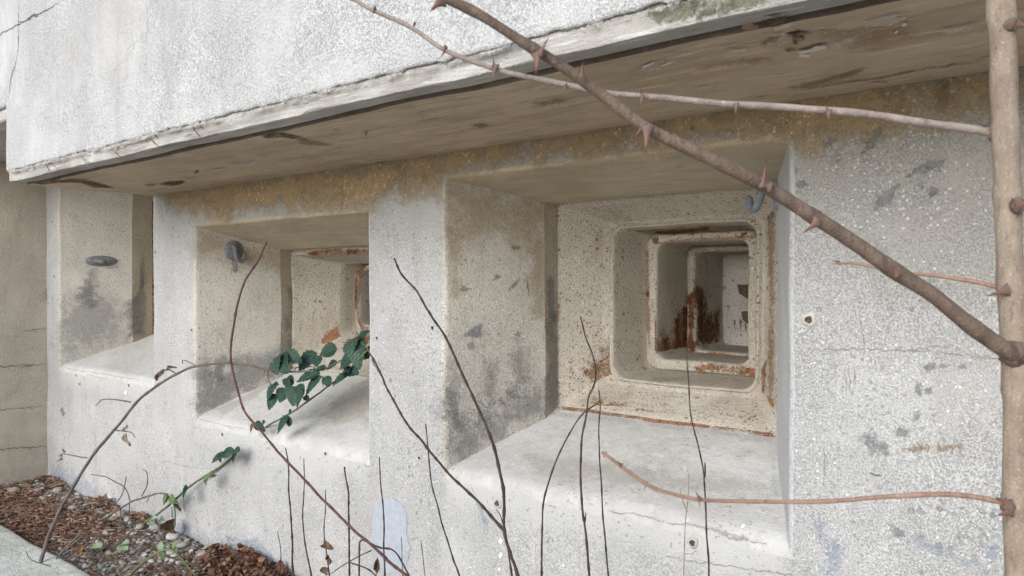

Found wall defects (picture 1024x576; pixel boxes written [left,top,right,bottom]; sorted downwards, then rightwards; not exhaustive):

crack [0,2,59,98]
spalling [762,13,827,57]
water stain [146,70,990,216]
corrosion [309,247,370,344]
corrosion [654,280,773,408]
corrosion [557,396,774,437]